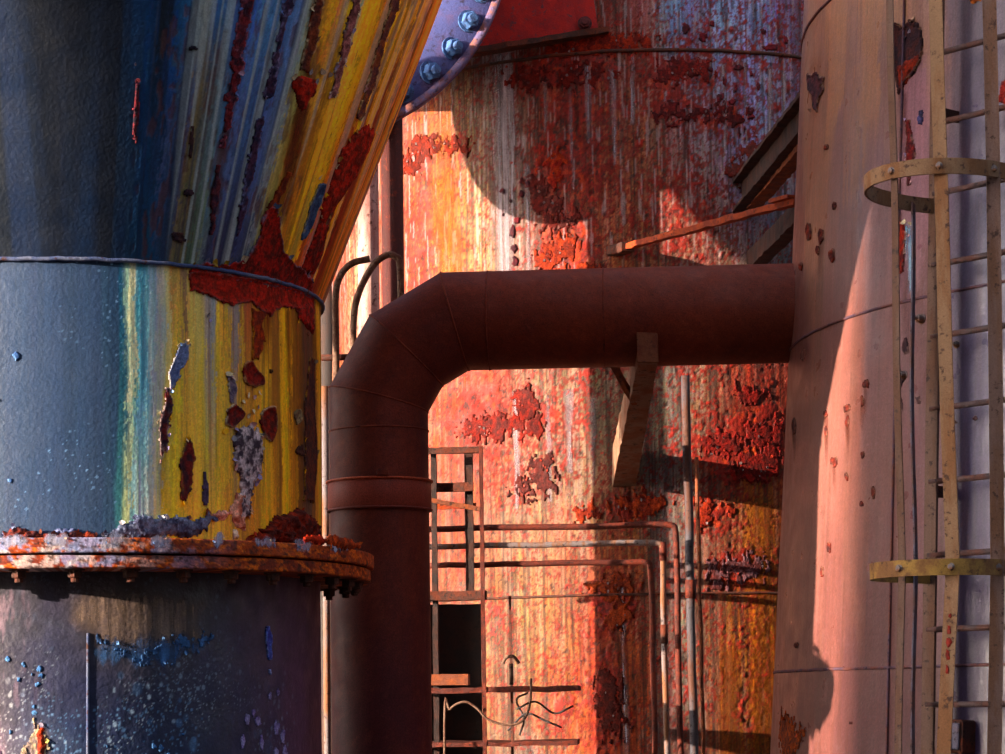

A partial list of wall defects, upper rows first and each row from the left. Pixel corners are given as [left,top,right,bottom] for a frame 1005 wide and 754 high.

peeling [219,0,254,149]
peeling [262,0,295,99]
peeling [328,0,361,99]
peeling [209,164,221,235]
peeling [236,116,265,237]
peeling [301,176,327,240]
corrosion [606,194,795,256]
peeling [157,339,191,463]
peeling [294,357,320,510]
peeling [5,656,43,687]
peeling [21,704,50,754]
corrosion [778,706,806,754]